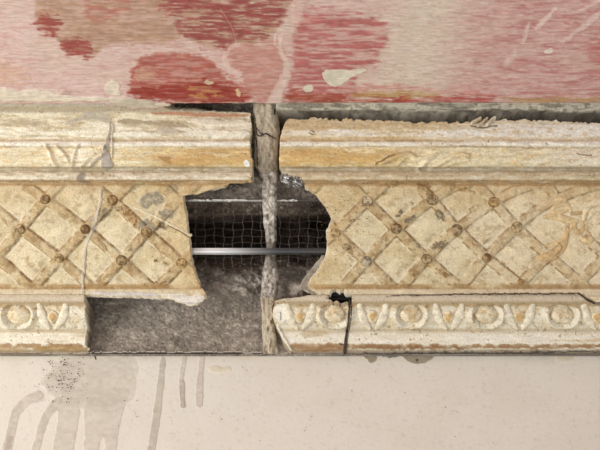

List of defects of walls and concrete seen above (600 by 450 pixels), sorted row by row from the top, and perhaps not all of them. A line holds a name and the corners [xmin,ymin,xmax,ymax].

crack [89,122,114,170]
peeling [127,179,145,193]
peeling [99,182,179,232]
crack [81,188,103,295]
peeling [87,291,205,306]
crack [386,292,595,304]
peeling [275,303,293,351]
crack [338,301,600,359]
leakage [1,356,139,450]
leakage [147,357,166,450]
leakage [178,356,187,409]
leakage [195,356,232,408]